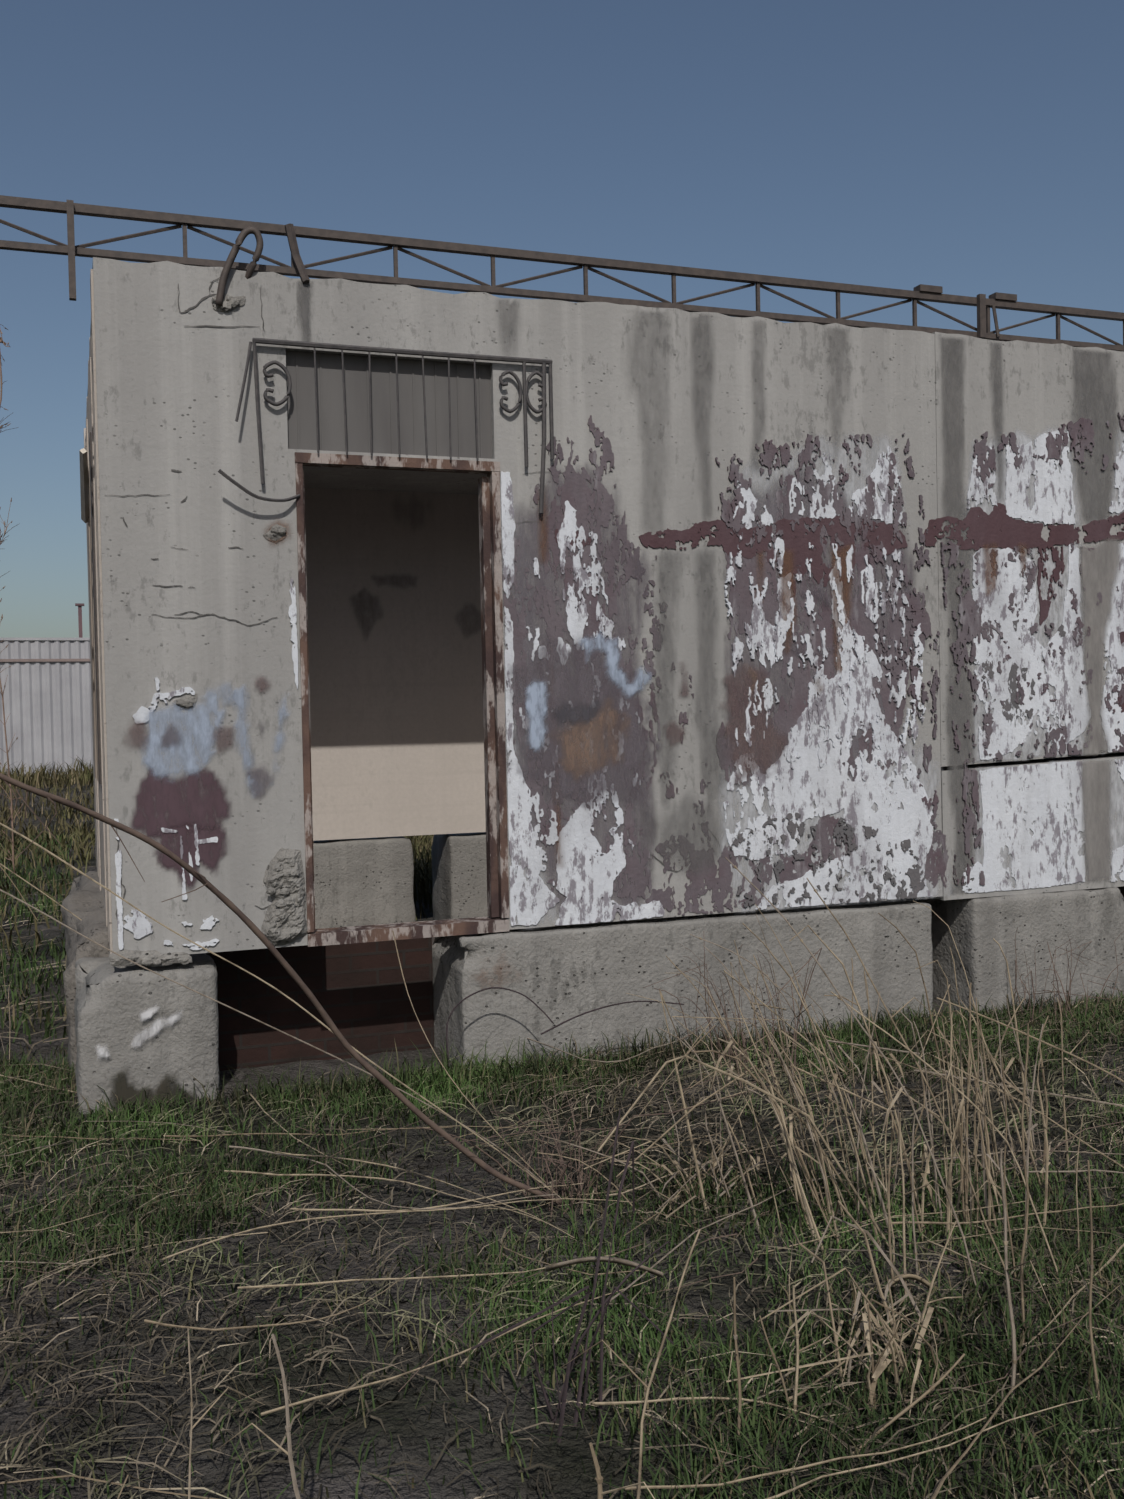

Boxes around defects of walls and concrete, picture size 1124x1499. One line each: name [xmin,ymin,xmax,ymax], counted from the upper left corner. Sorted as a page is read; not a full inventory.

crack [105,469,187,526]
peeling [132,677,197,724]
crack [151,547,277,626]
peeling [500,412,1124,926]
water stain [720,338,1124,911]
spalling [261,848,308,946]